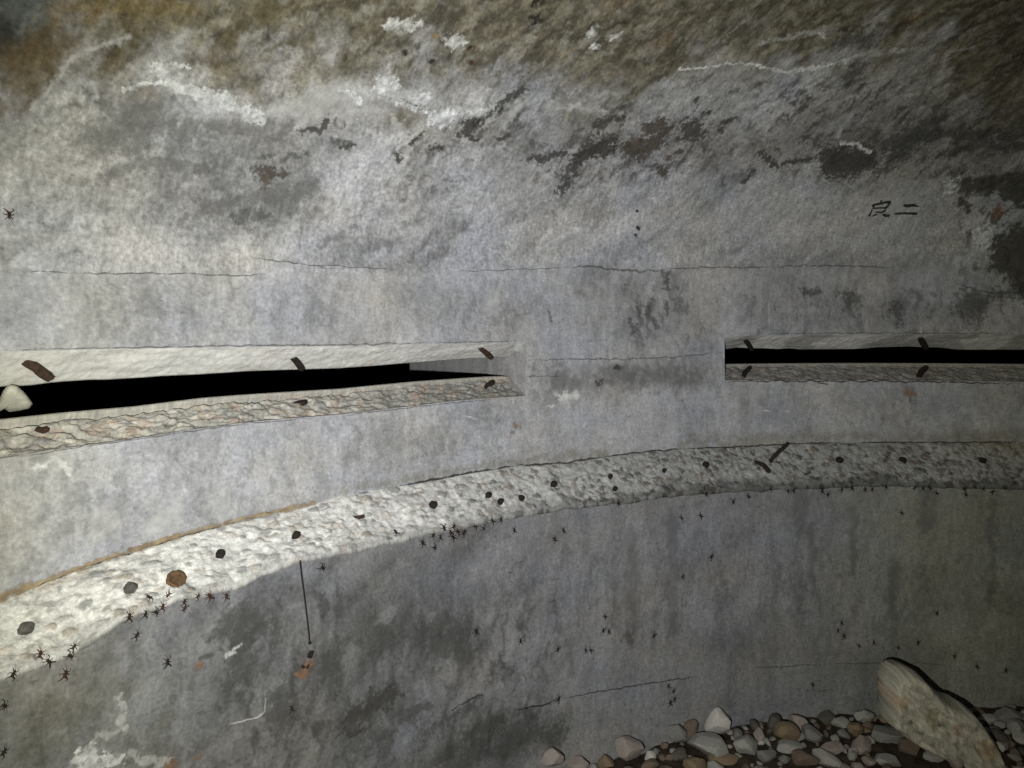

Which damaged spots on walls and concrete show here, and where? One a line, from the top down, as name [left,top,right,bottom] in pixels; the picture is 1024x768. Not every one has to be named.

damp [759,26,826,45]
damp [678,35,921,85]
damp [122,59,533,163]
damp [250,153,307,190]
damp [526,97,737,197]
damp [740,114,1024,184]
crack [519,677,690,710]